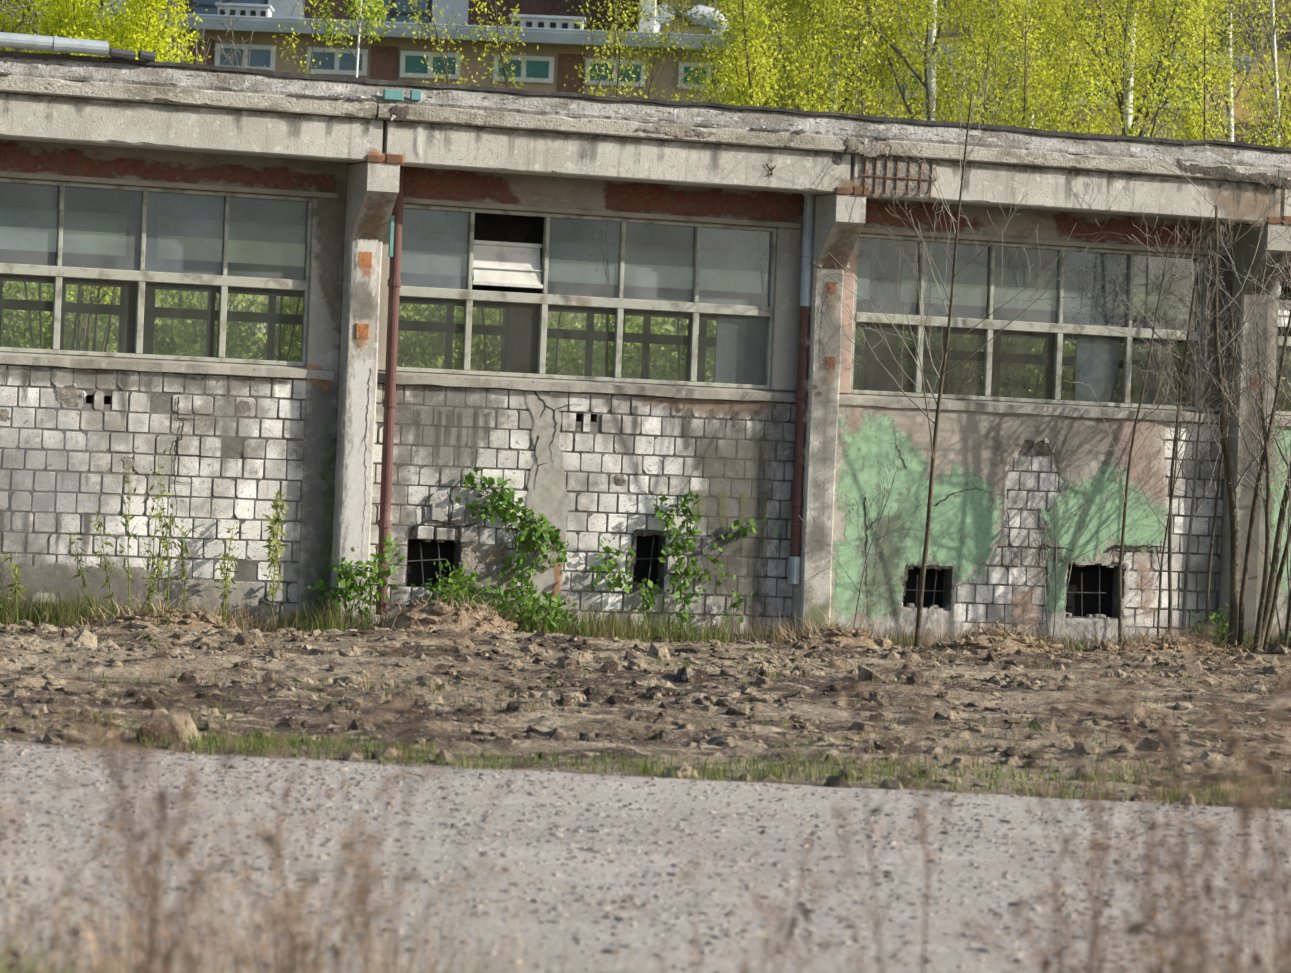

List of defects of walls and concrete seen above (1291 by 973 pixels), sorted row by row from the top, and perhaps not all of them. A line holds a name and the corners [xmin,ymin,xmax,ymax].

peeling [0,142,337,192]
peeling [404,167,520,204]
peeling [605,183,804,223]
spalling [833,135,983,232]
peeling [1054,213,1205,247]
crack [527,390,583,490]
peeling [830,405,1168,637]